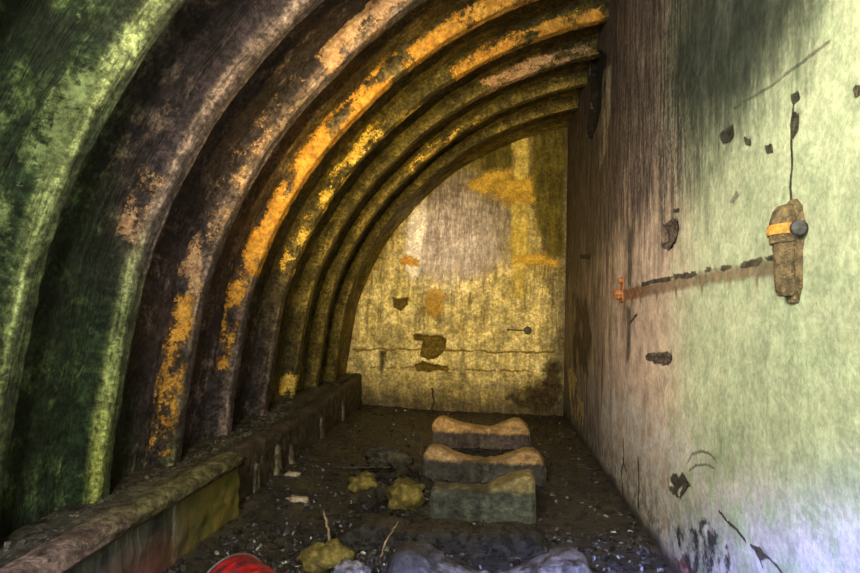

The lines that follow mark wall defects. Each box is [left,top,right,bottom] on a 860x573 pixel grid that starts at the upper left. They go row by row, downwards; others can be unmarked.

peeling [448,6,607,138]
water stain [676,0,813,141]
crack [733,40,829,109]
water stain [599,66,612,166]
spalling [790,91,799,139]
peeling [216,0,558,372]
spalling [661,208,679,251]
rust [623,262,774,319]
spalling [645,351,671,366]
crack [687,450,715,471]
water stain [675,518,730,573]
crack [719,510,783,573]